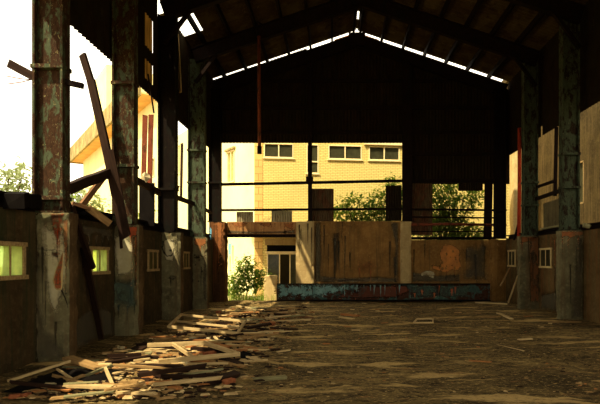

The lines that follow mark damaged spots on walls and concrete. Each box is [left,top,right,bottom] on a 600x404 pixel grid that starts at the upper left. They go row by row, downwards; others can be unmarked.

flaking render [35,214,67,309]
flaking render [115,236,133,274]
damp [228,223,398,282]
peeling [421,245,462,278]
peeling [278,284,360,298]